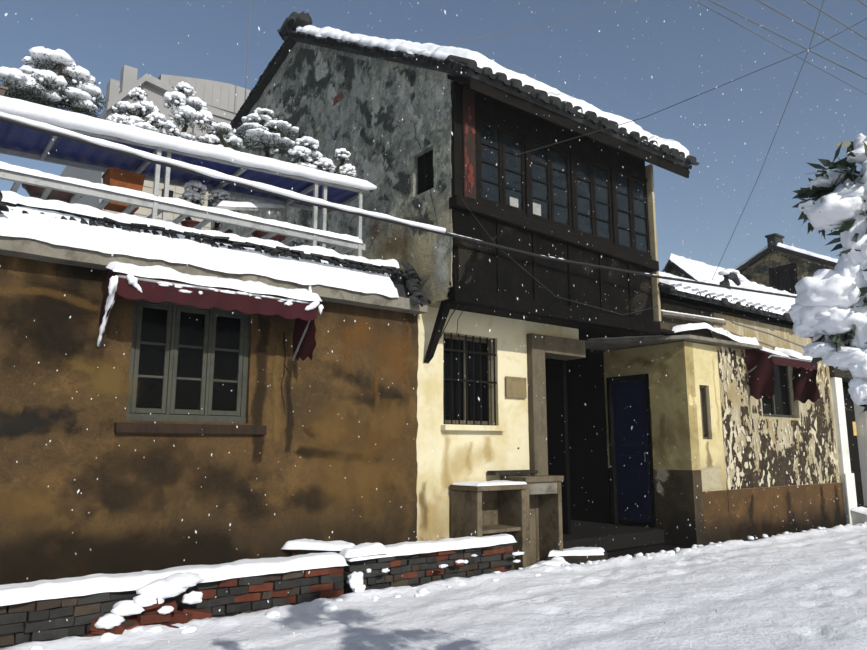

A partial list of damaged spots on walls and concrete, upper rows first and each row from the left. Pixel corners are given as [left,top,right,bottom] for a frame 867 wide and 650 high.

mould [266,47,434,236]
water stain [273,332,294,451]
peeling [717,346,839,490]
water stain [96,450,180,510]
water stain [195,467,265,515]